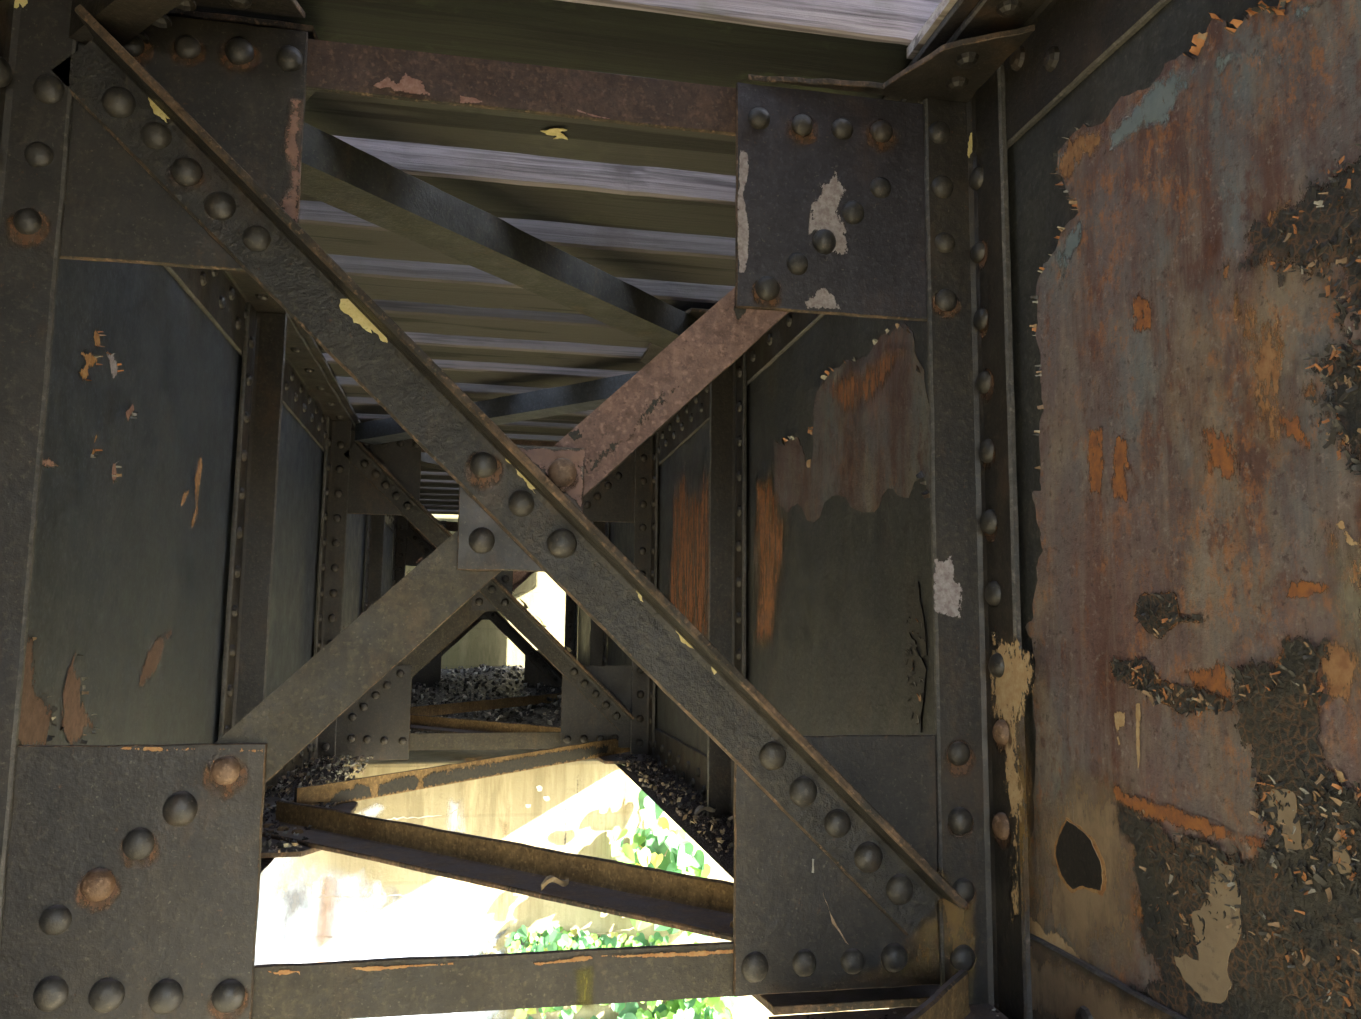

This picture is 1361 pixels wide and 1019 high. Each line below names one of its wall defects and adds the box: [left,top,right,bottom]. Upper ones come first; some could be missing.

peeling [737,150,749,273]
peeling [808,171,848,255]
peeling [804,287,841,310]
peeling [112,461,122,483]
corrosion [1086,426,1130,502]
peeling [1025,0,1361,1019]
corrosion [756,478,783,643]
peeling [18,634,97,745]
corrosion [1148,660,1233,712]
corrosion [1316,640,1359,714]
corrosion [1113,786,1265,865]
corrosion [1023,946,1161,1019]